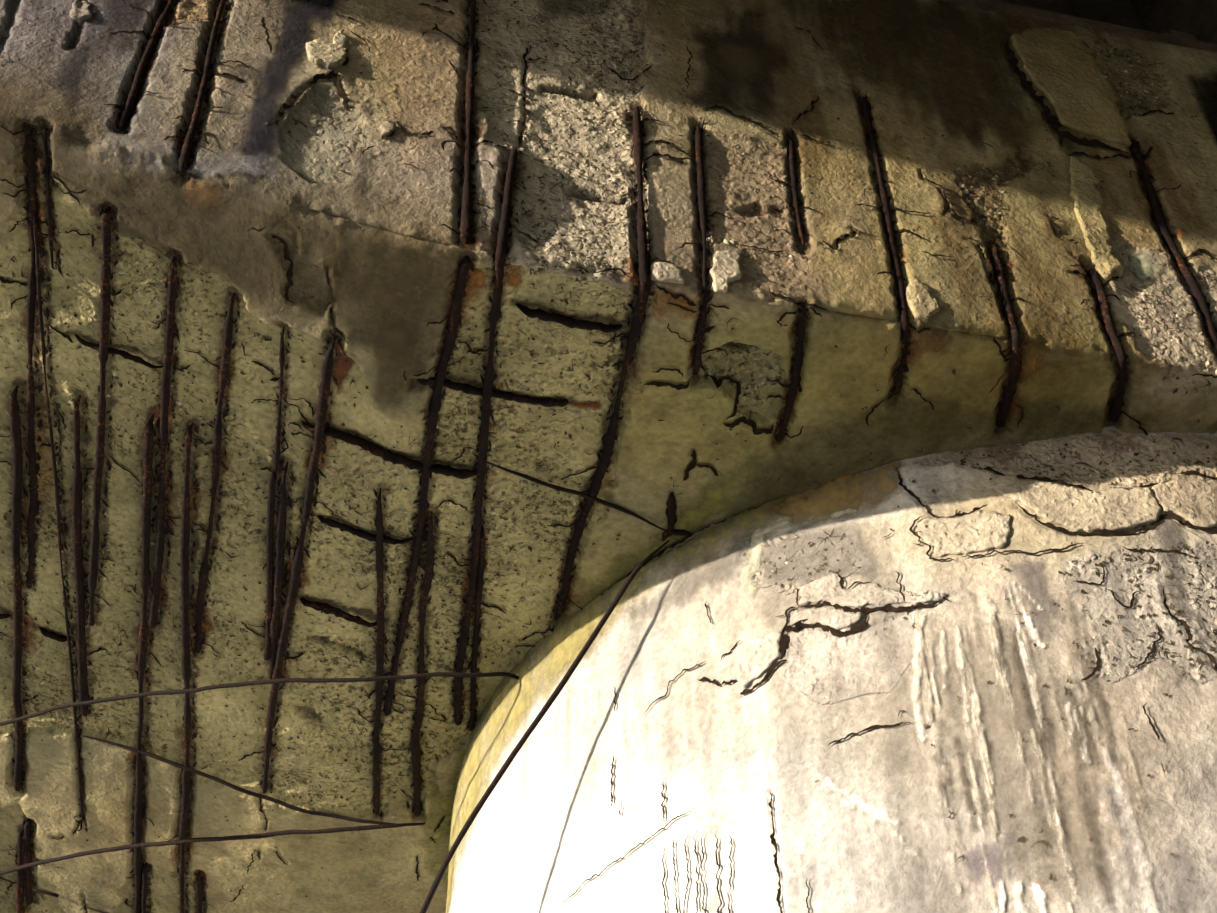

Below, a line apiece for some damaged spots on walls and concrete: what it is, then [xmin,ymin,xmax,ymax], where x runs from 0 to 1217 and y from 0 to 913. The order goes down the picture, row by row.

leakage [192,0,336,180]
leakage [691,11,787,115]
leakage [1190,73,1217,144]
corrosion [35,404,57,515]
corrosion [331,343,353,393]
spalling [0,0,840,913]
corrosion [558,399,601,409]
spalling [844,15,1217,695]
crack [896,464,1217,671]
crack [645,571,949,712]
crack [610,755,622,817]
crack [828,722,910,745]